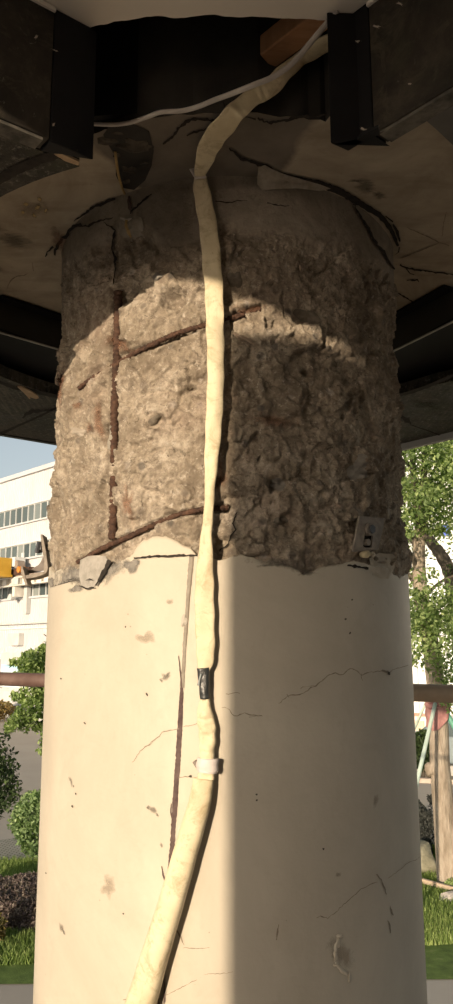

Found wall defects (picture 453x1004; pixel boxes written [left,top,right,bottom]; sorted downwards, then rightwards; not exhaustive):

crack [163,101,226,145]
crack [247,112,327,125]
crack [45,194,152,284]
crack [229,148,453,302]
spalling [46,176,412,589]
crack [222,665,408,717]
crack [134,723,197,761]